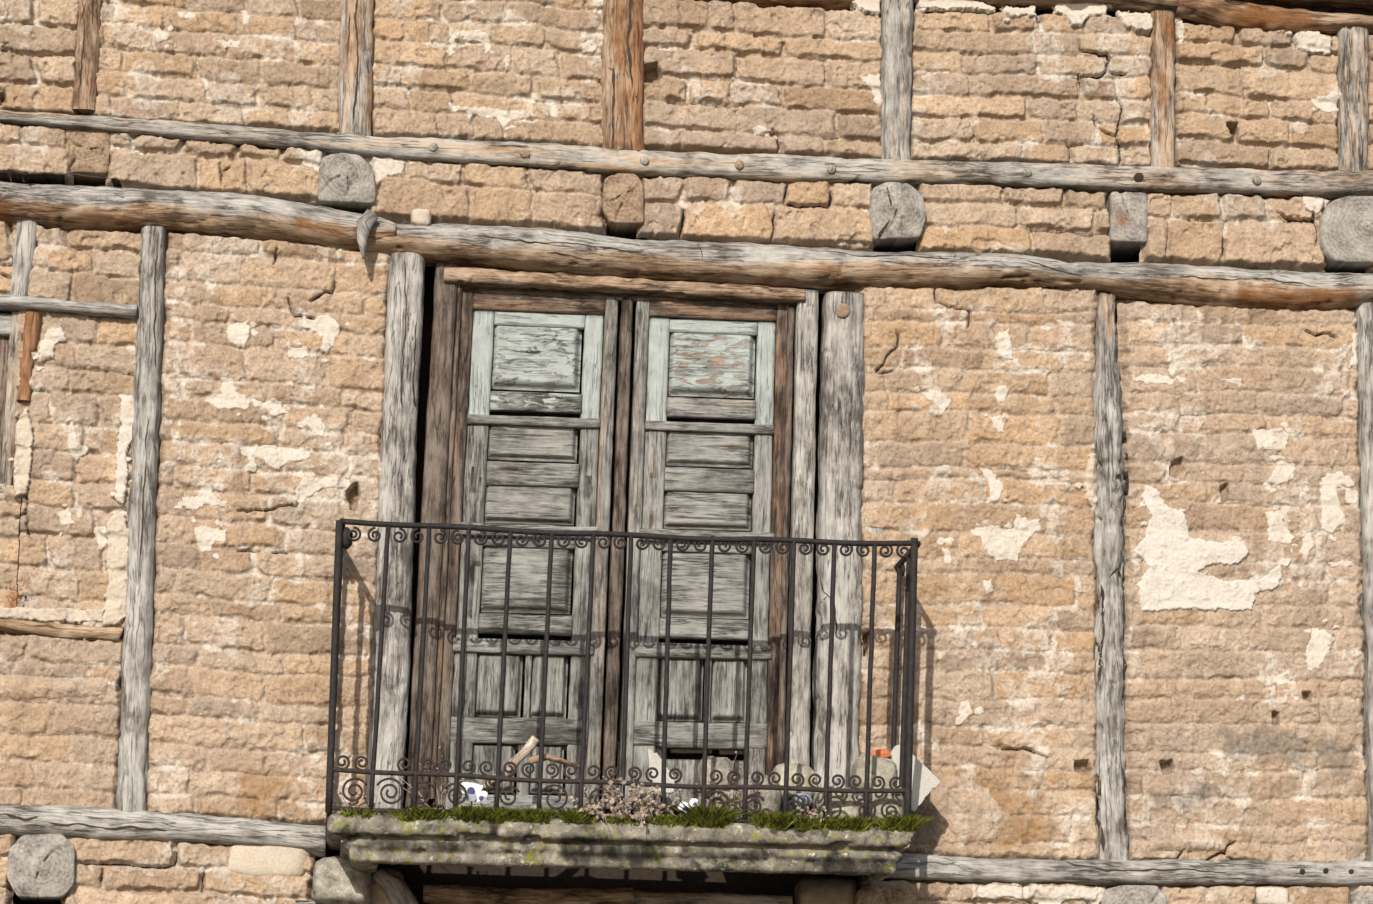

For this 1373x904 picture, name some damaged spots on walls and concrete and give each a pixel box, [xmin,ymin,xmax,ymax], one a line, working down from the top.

crack [1077,52,1125,165]
crack [876,333,899,374]
flaking render [937,537,955,564]
flaking render [982,579,993,595]
flaking render [970,468,1041,561]
flaking render [1132,422,1359,612]